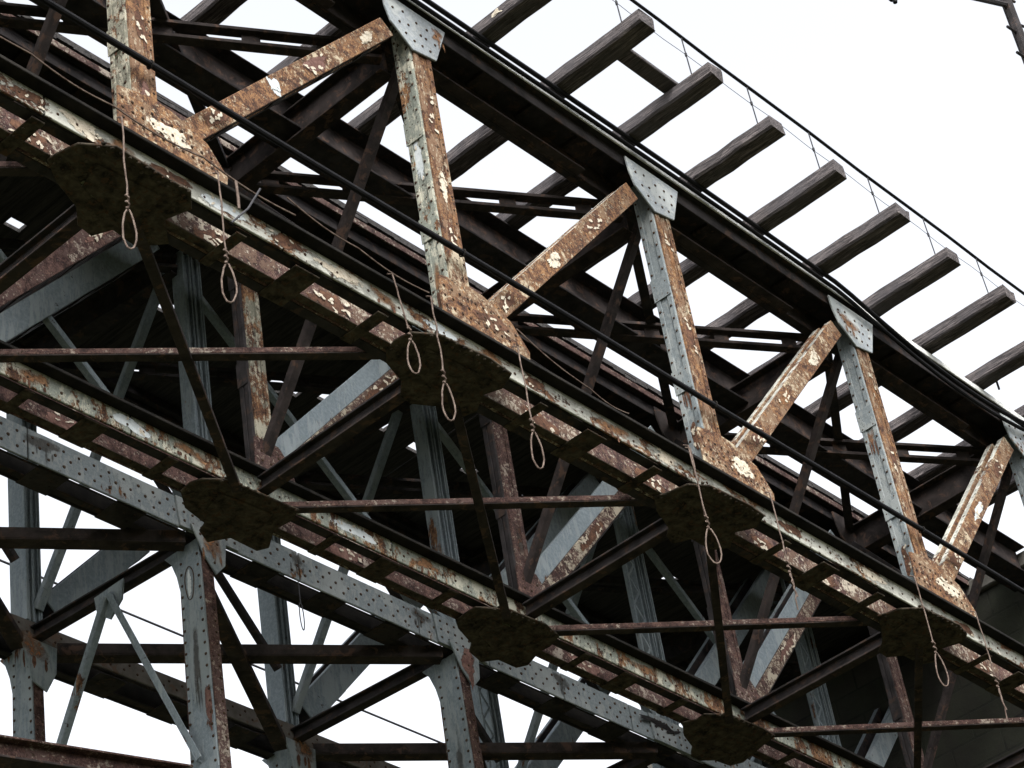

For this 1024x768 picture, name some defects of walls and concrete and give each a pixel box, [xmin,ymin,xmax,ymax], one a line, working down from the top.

rust [134,7,147,52]
peeling [360,31,372,44]
rust [203,108,229,127]
peeling [146,117,192,149]
rust [447,222,457,245]
peeling [422,317,457,341]
rust [45,411,76,429]
rust [751,426,765,447]
peeling [731,456,754,479]
rust [634,468,666,493]
rust [329,545,363,563]
peeling [936,577,959,598]